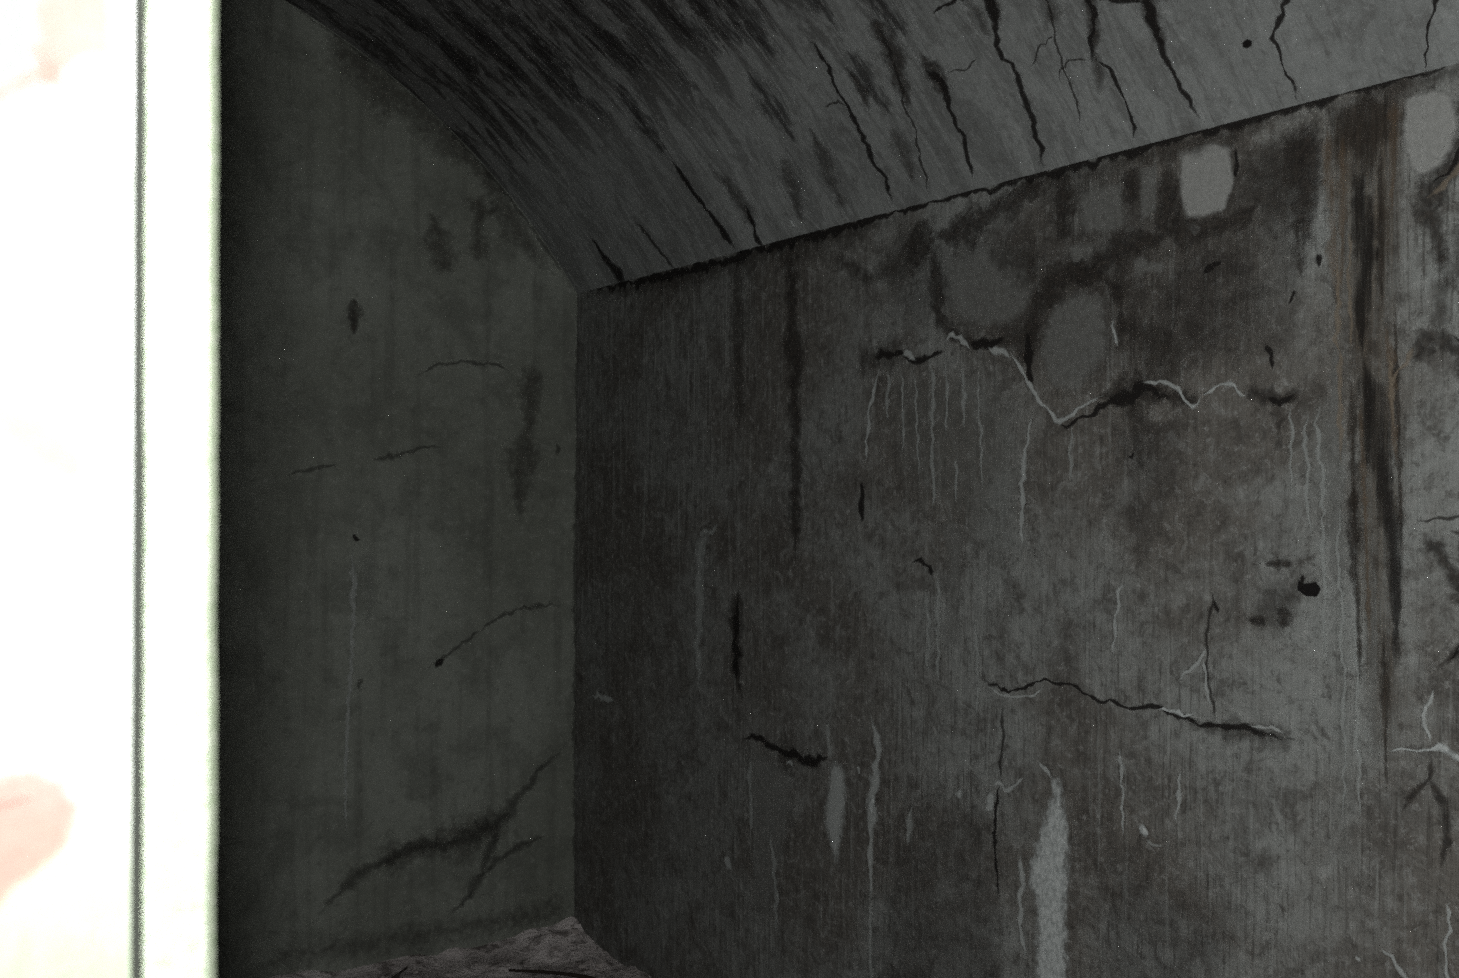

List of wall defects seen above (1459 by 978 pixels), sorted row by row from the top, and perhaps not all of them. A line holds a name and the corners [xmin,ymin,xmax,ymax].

damp [910,179,1040,349]
crack [590,0,1445,292]
damp [1024,169,1254,383]
damp [1291,130,1320,239]
damp [886,364,983,502]
crack [858,332,1297,521]
crack [1425,516,1459,602]
crack [746,733,826,767]
efflorescence [986,778,1023,894]
efflorescence [1017,763,1069,978]
crack [988,595,1289,773]
crack [1392,647,1459,860]